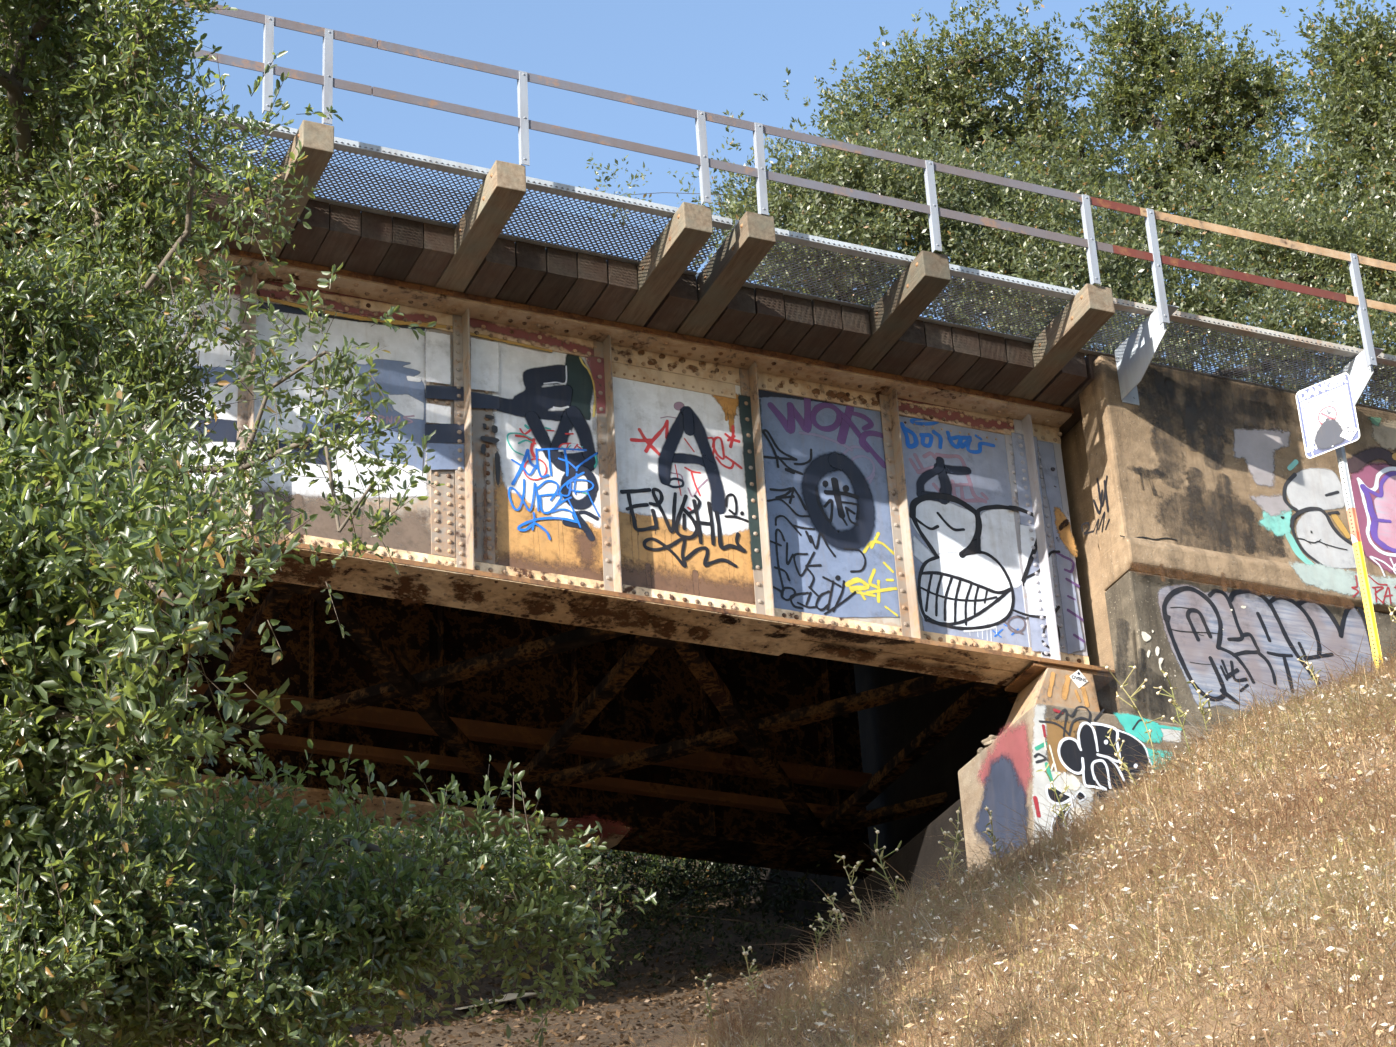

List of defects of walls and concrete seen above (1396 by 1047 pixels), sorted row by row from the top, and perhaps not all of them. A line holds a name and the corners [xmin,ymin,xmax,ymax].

corrosion [638,350,716,373]
corrosion [812,388,879,406]
leakage [1133,359,1290,557]
corrosion [222,547,339,585]
corrosion [397,575,430,606]
corrosion [449,579,486,604]
corrosion [765,624,991,682]